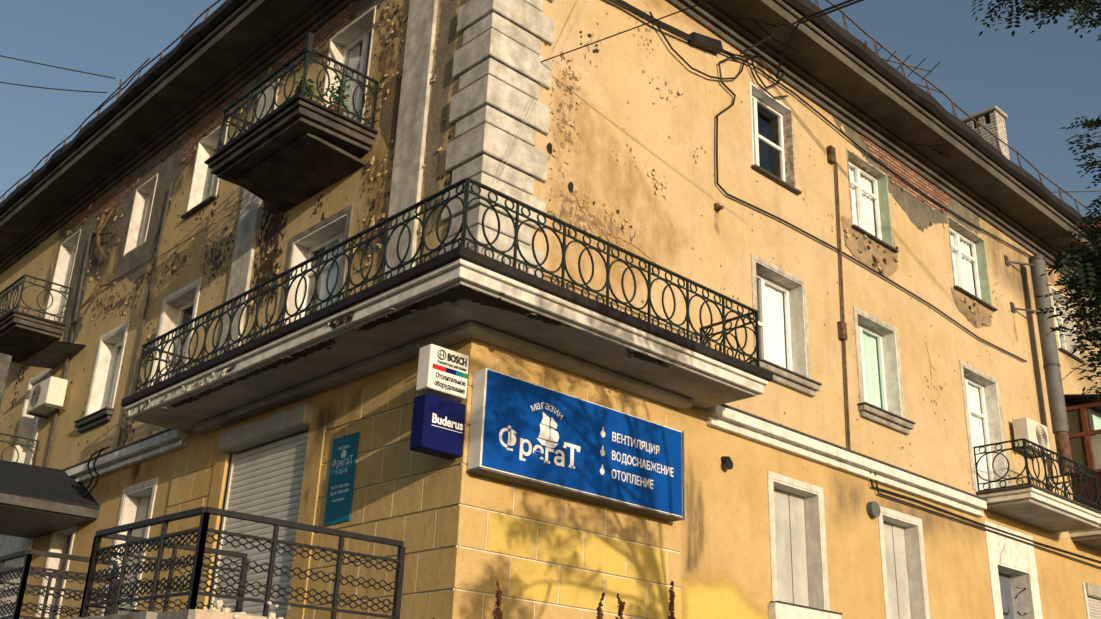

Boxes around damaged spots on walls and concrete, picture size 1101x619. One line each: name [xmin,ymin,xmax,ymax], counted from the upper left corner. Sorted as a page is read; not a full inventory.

peeling [546,31,633,249]
flaking render [63,0,408,343]
flaking render [842,216,899,278]
flaking render [950,286,993,328]
flaking render [194,600,291,619]